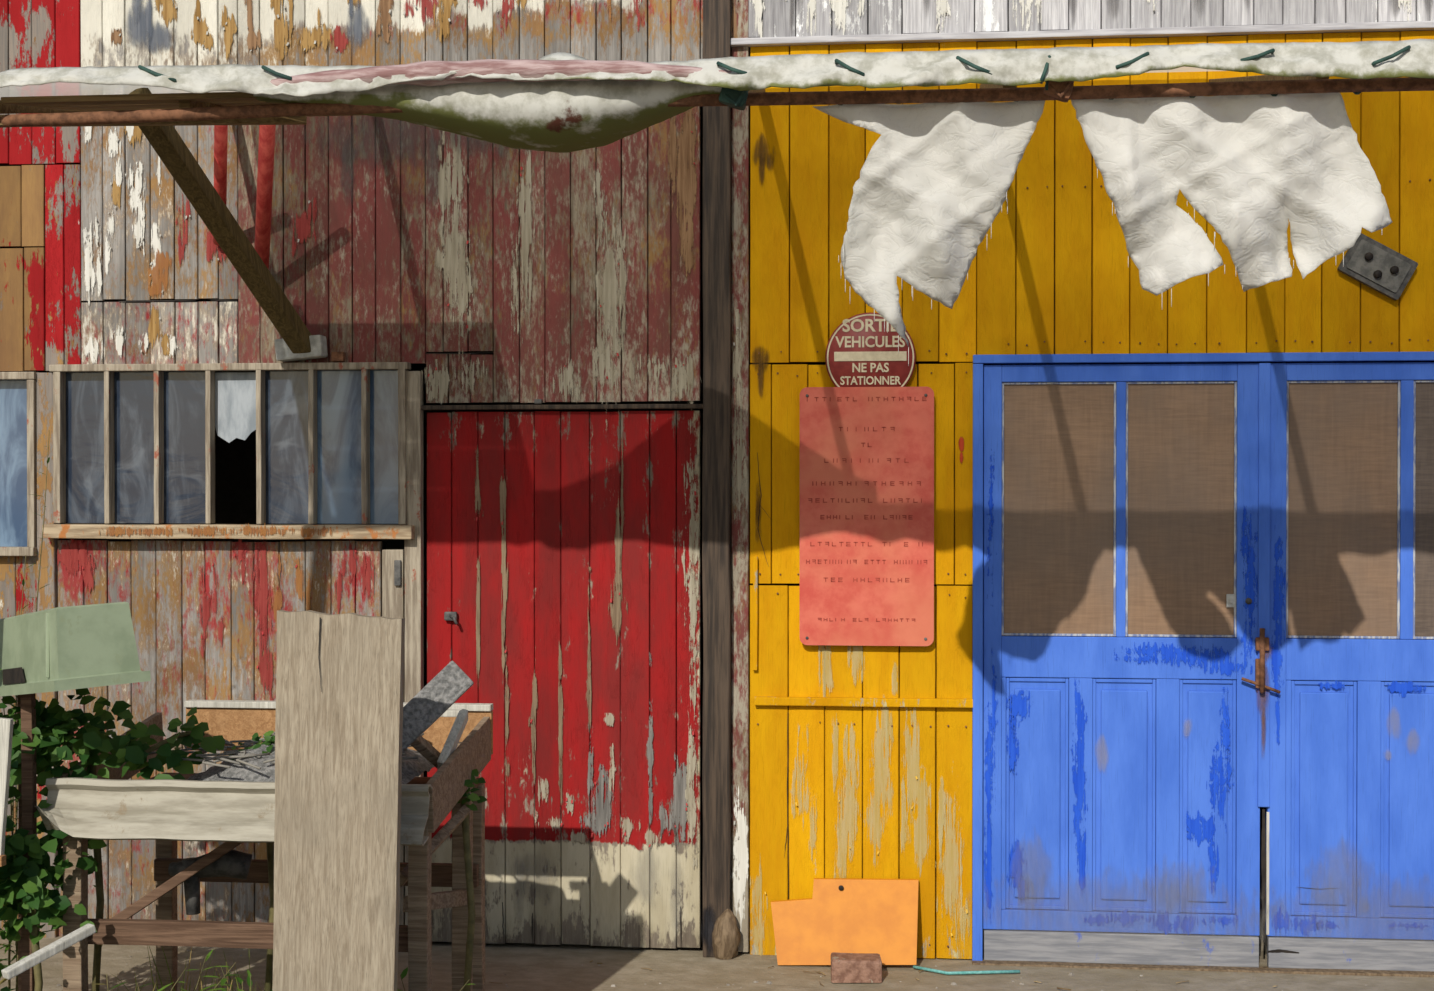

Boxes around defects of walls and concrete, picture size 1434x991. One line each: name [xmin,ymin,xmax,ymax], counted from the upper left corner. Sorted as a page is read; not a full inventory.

peeling [154,0,348,61]
peeling [376,0,527,44]
peeling [78,126,191,364]
peeling [422,131,487,403]
peeling [511,150,535,341]
peeling [500,476,510,781]
peeling [528,169,700,869]
peeling [818,645,865,697]
peeling [832,663,970,945]
peeling [1071,679,1088,896]
peeling [1114,506,1286,893]
corrosion [1261,651,1269,744]